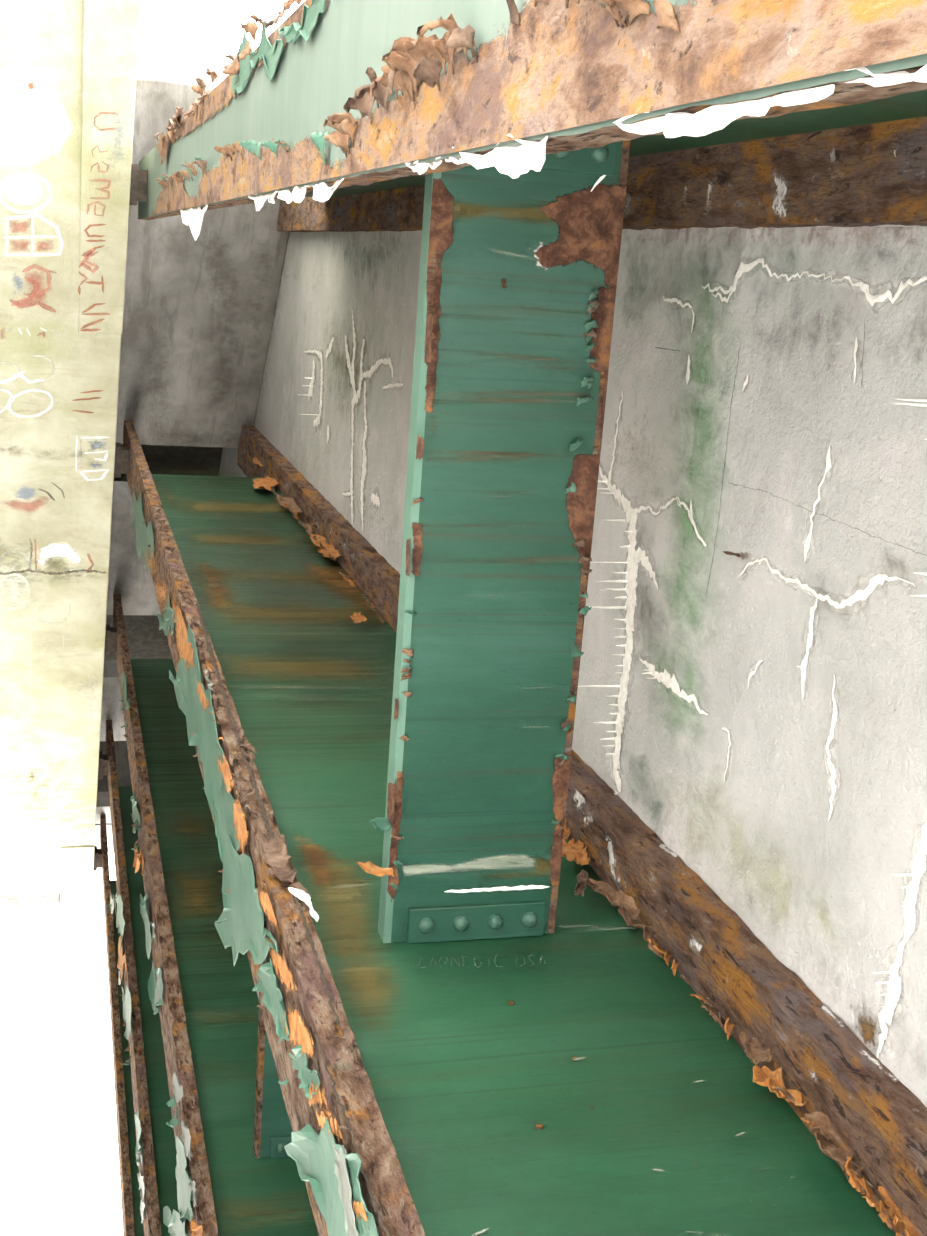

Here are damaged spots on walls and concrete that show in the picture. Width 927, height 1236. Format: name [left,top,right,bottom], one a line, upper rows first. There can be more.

peeling [248,178,344,211]
peeling [405,134,548,179]
corrosion [152,0,927,216]
peeling [613,64,927,138]
crack [302,310,403,531]
corrosion [424,178,626,689]
crack [663,258,927,385]
crack [578,391,733,792]
crack [737,447,927,821]
peeling [130,492,379,1236]
corrosion [239,790,331,922]
corrosion [856,1017,876,1046]